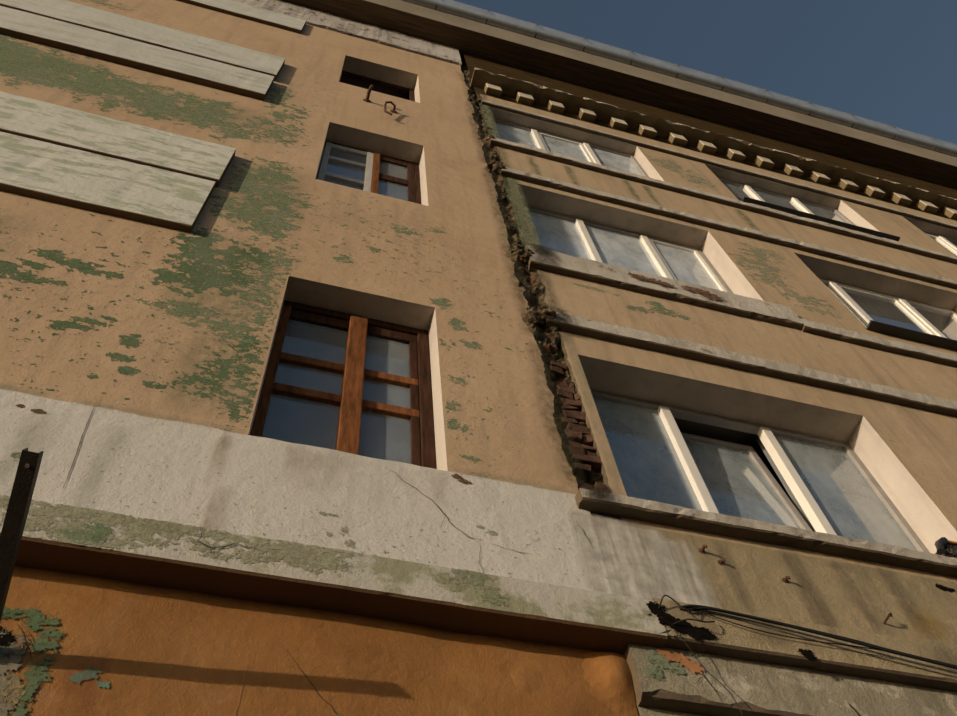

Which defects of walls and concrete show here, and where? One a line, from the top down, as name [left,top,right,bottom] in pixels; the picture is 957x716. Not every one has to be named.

peeling [0,34,530,431]
peeling [628,272,724,300]
peeling [445,387,507,440]
spalling [451,454,501,491]
crack [386,467,530,574]
peeling [24,493,512,606]
spalling [0,606,66,716]
peeling [644,647,708,681]
spalling [797,649,817,662]